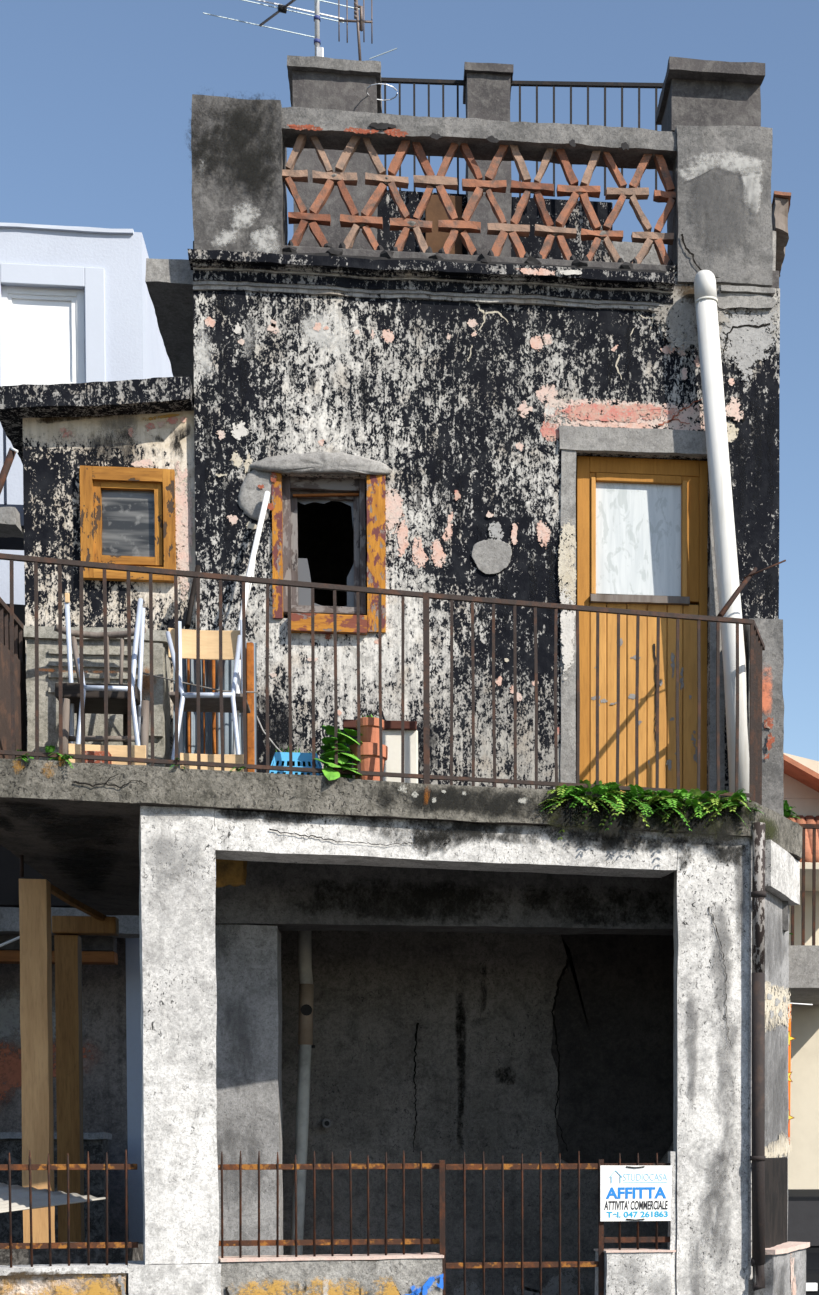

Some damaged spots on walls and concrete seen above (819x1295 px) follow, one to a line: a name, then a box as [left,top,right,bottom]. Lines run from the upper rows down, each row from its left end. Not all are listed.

water stain [189,97,285,195]
flaking render [693,156,760,209]
flaking render [517,384,705,442]
flaking render [385,488,461,568]
water stain [417,724,439,768]
water stain [219,809,327,823]
water stain [343,786,779,1007]
water stain [456,995,466,1144]
crack [551,952,571,1151]
water stain [688,1003,697,1099]
water stain [0,1271,59,1279]
peeling [238,1277,399,1295]